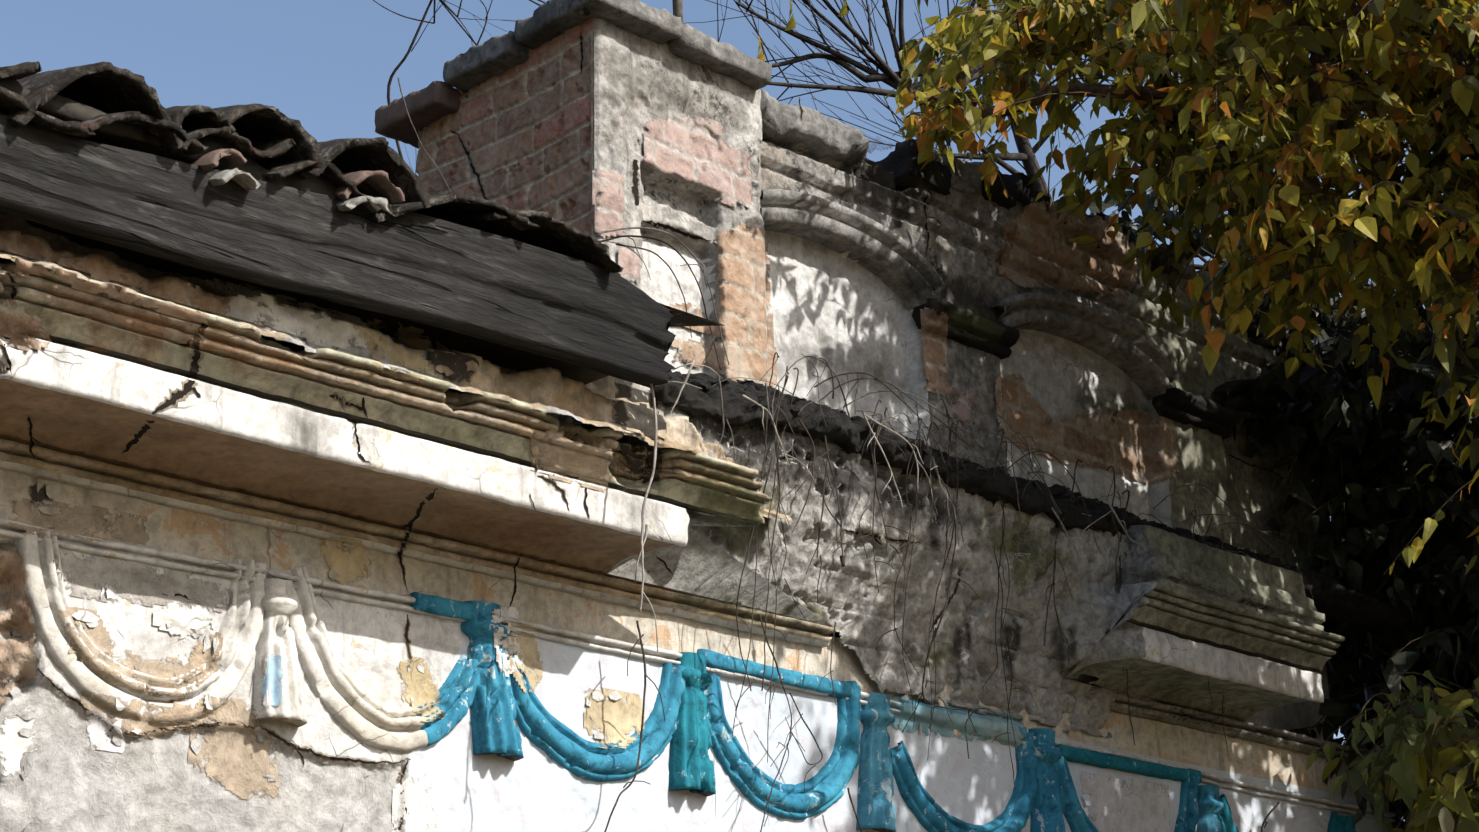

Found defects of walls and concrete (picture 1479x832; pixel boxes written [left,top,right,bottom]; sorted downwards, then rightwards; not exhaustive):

peeling [0,478,283,800]